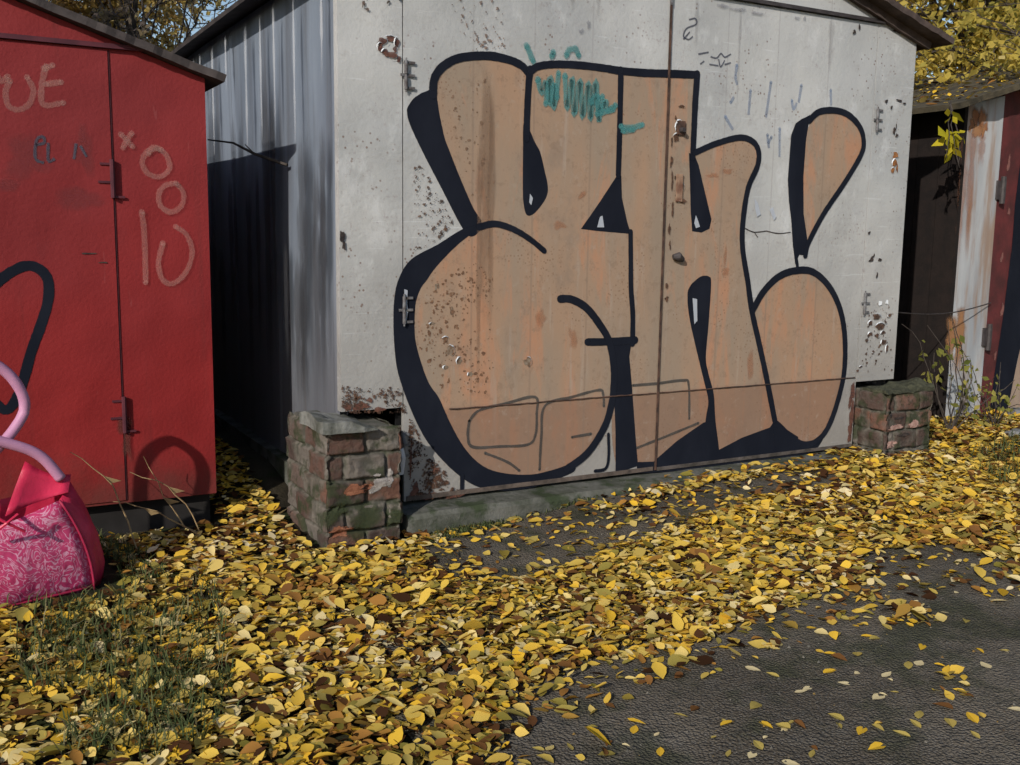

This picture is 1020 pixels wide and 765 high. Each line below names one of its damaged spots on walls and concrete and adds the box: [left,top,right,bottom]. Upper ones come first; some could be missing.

corrosion [969,108,988,137]
corrosion [414,165,453,250]
corrosion [341,385,464,502]